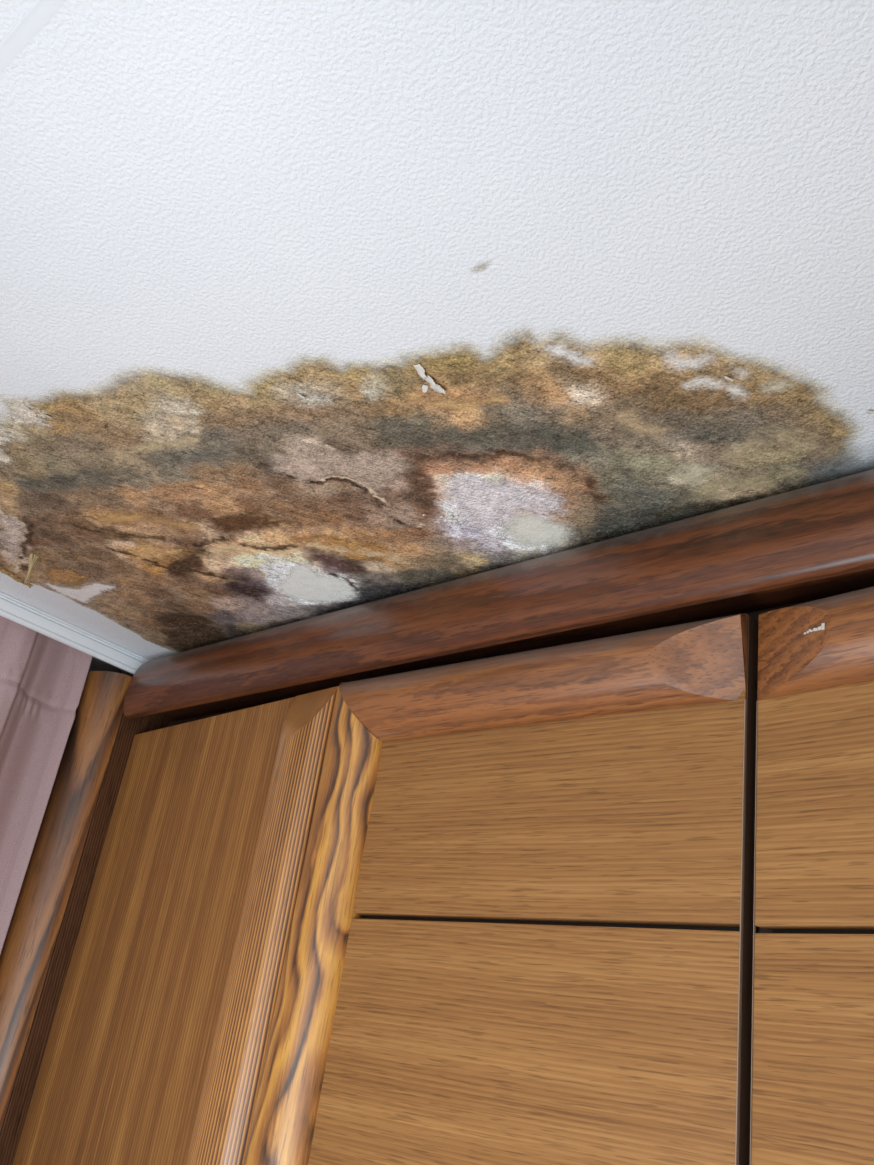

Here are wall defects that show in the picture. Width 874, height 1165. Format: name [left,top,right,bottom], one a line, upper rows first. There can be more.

water stain [0,330,874,652]